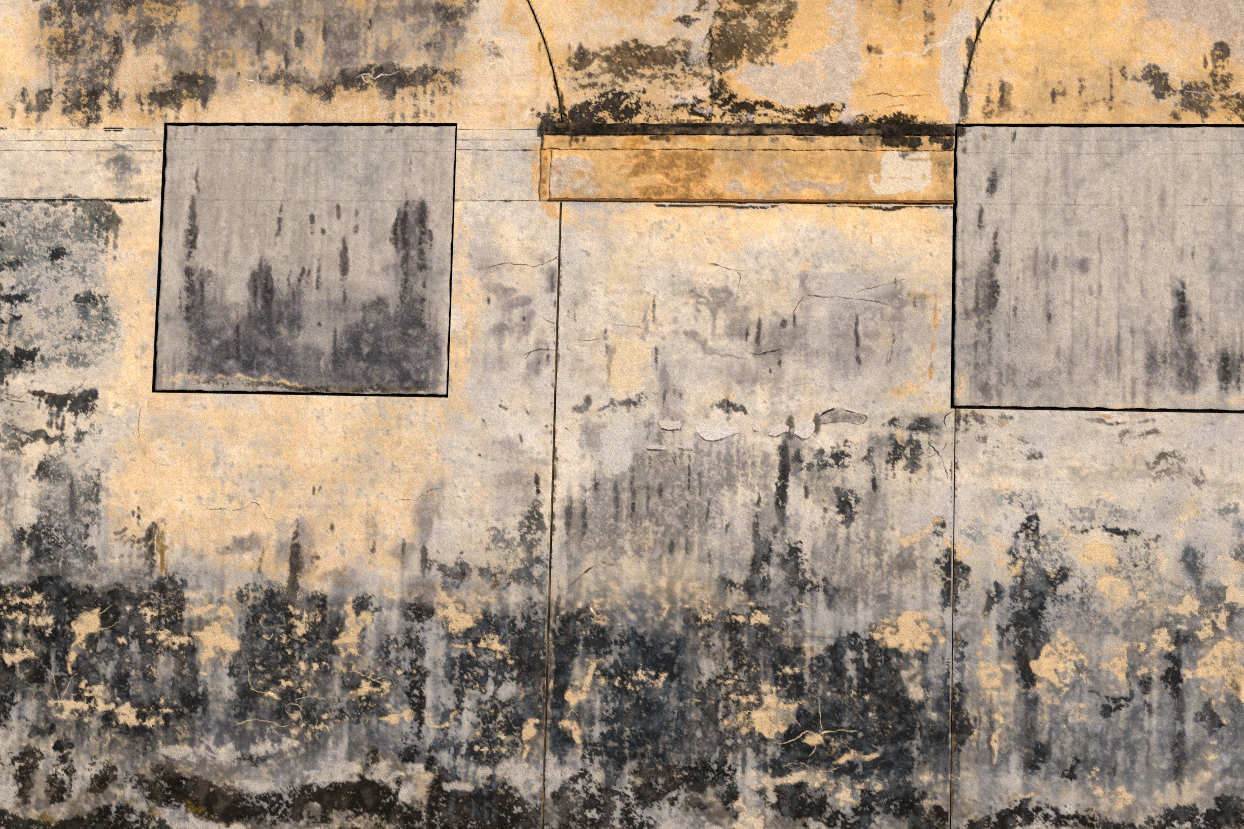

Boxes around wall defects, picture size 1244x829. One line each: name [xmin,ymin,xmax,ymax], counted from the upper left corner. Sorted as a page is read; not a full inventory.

damp [0,0,479,132]
damp [983,81,1027,118]
damp [1045,41,1244,122]
damp [956,232,1043,459]
damp [1145,280,1244,404]
peeling [600,422,633,475]
peeling [646,408,867,451]
damp [1087,404,1159,442]
peeling [4,645,34,664]
peeling [0,590,52,636]
peeling [50,609,171,727]
peeling [1029,530,1244,704]